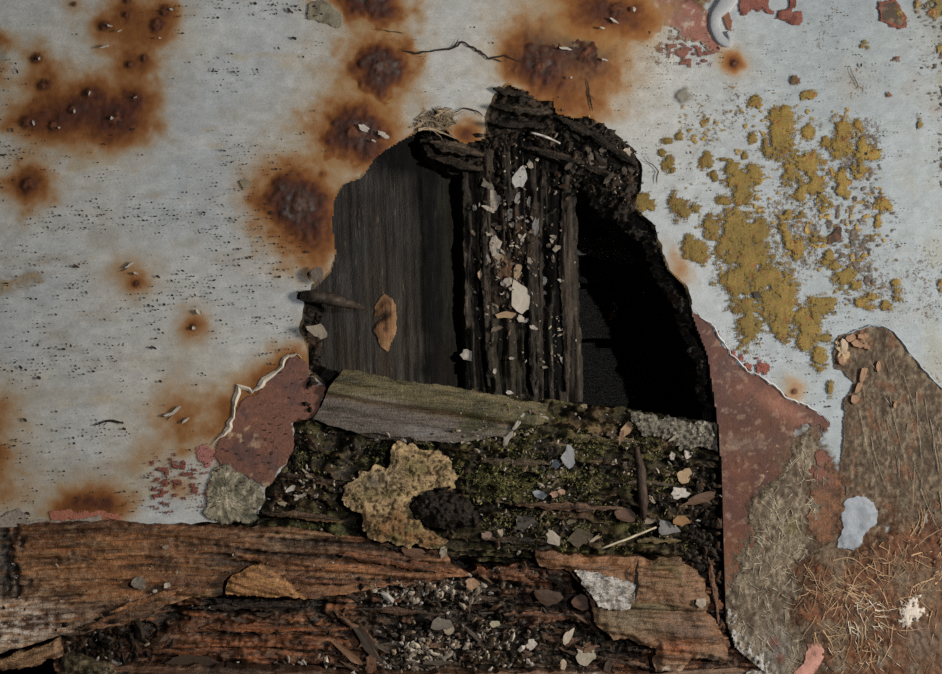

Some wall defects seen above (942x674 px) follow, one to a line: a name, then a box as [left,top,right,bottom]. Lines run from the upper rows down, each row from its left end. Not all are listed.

corrosion [0,0,182,217]
corrosion [243,0,427,278]
crack [376,29,522,62]
peeling [512,159,533,188]
corrosion [495,0,664,123]
peeling [642,0,724,68]
corrosion [720,50,747,75]
peeling [722,0,803,31]
peeling [481,177,547,322]
peeling [0,134,327,507]
peeling [623,70,942,608]
corrosion [0,395,27,504]